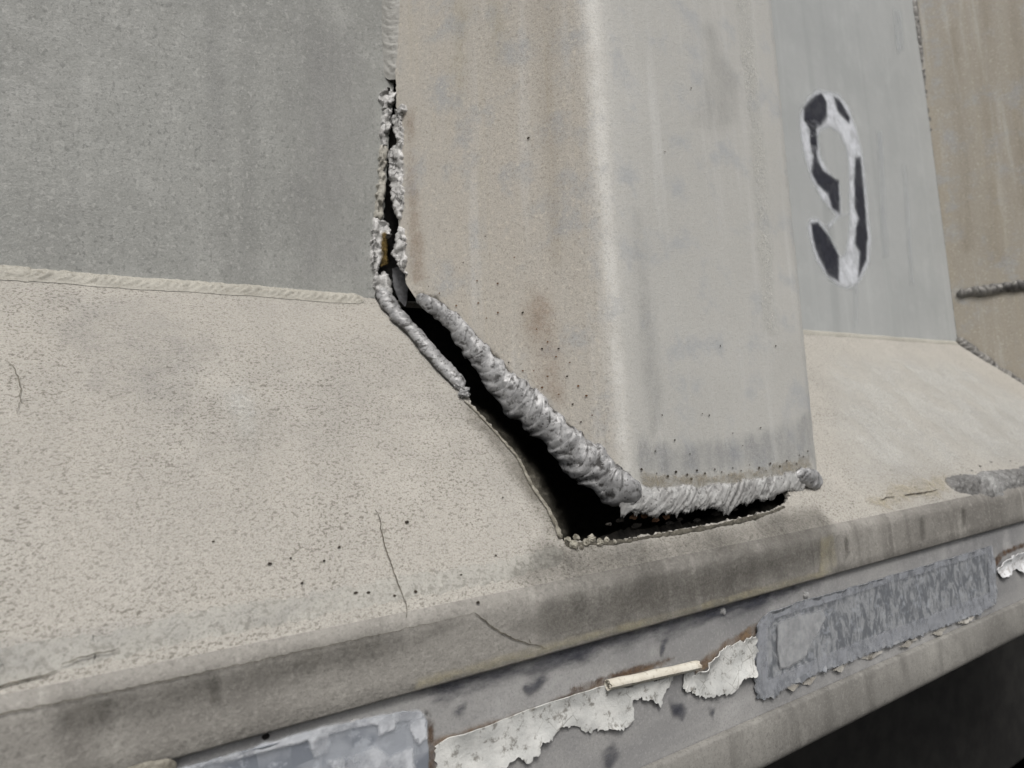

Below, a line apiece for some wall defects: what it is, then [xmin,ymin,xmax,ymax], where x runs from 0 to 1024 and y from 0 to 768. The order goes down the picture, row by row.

crack [370,87,414,307]
crack [454,382,785,550]
crack [0,509,547,715]
peeling [997,552,1024,578]
peeling [434,636,758,768]